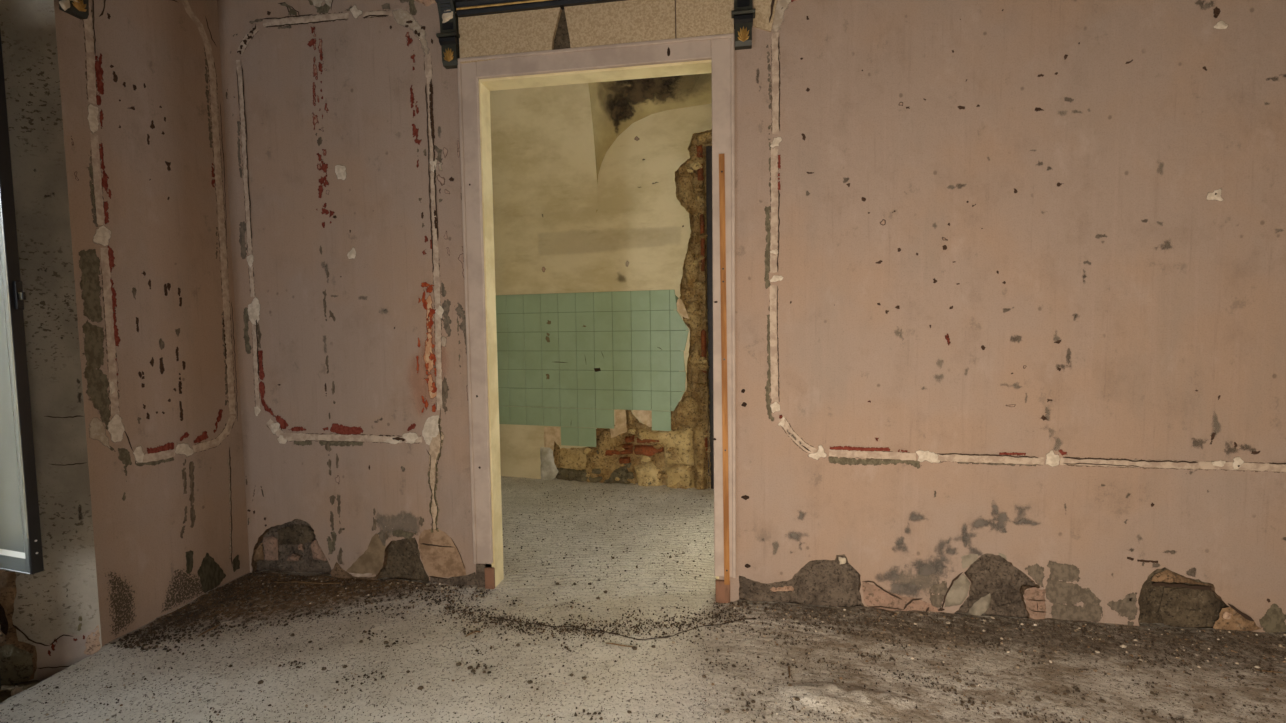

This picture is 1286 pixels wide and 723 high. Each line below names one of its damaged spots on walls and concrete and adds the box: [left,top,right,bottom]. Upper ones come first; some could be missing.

peeling [74,53,146,224]
peeling [381,0,471,277]
mould [607,75,681,132]
flaking render [79,245,121,429]
spalling [107,246,478,593]
flaking render [553,129,718,490]
mould [877,505,1037,608]
spalling [739,552,1286,633]